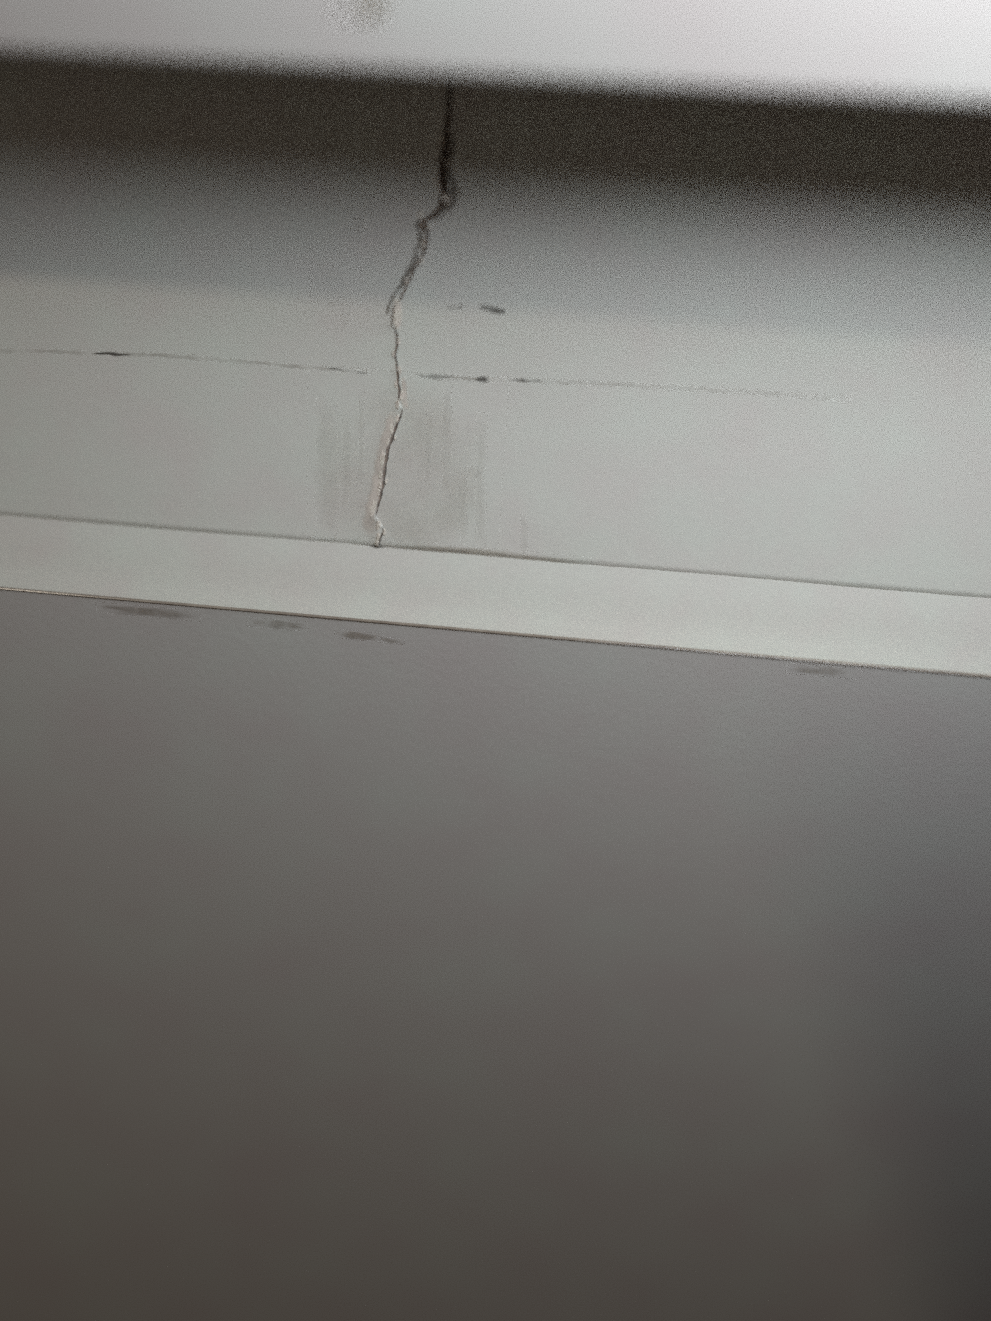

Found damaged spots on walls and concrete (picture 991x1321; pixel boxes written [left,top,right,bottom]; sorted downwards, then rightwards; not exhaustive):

crack [365,76,456,547]